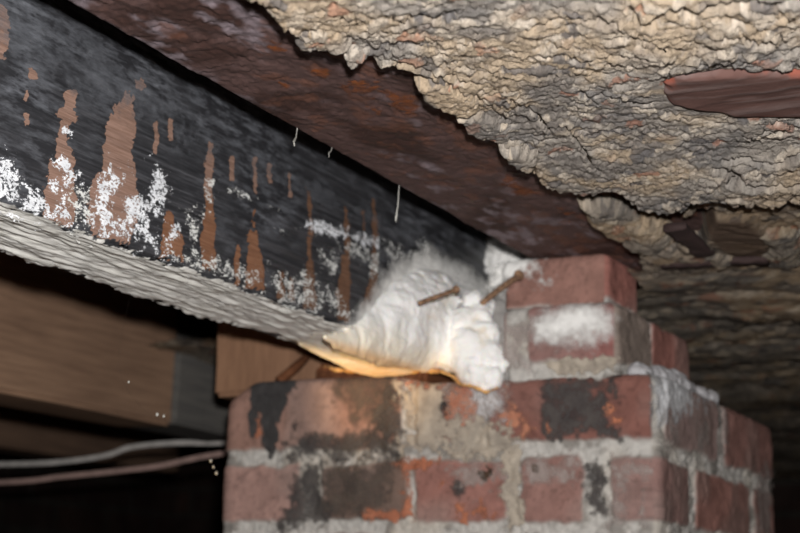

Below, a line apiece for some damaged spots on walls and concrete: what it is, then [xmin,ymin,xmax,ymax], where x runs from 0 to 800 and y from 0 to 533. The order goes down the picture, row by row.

damp [0,149,443,343]
damp [248,394,288,459]